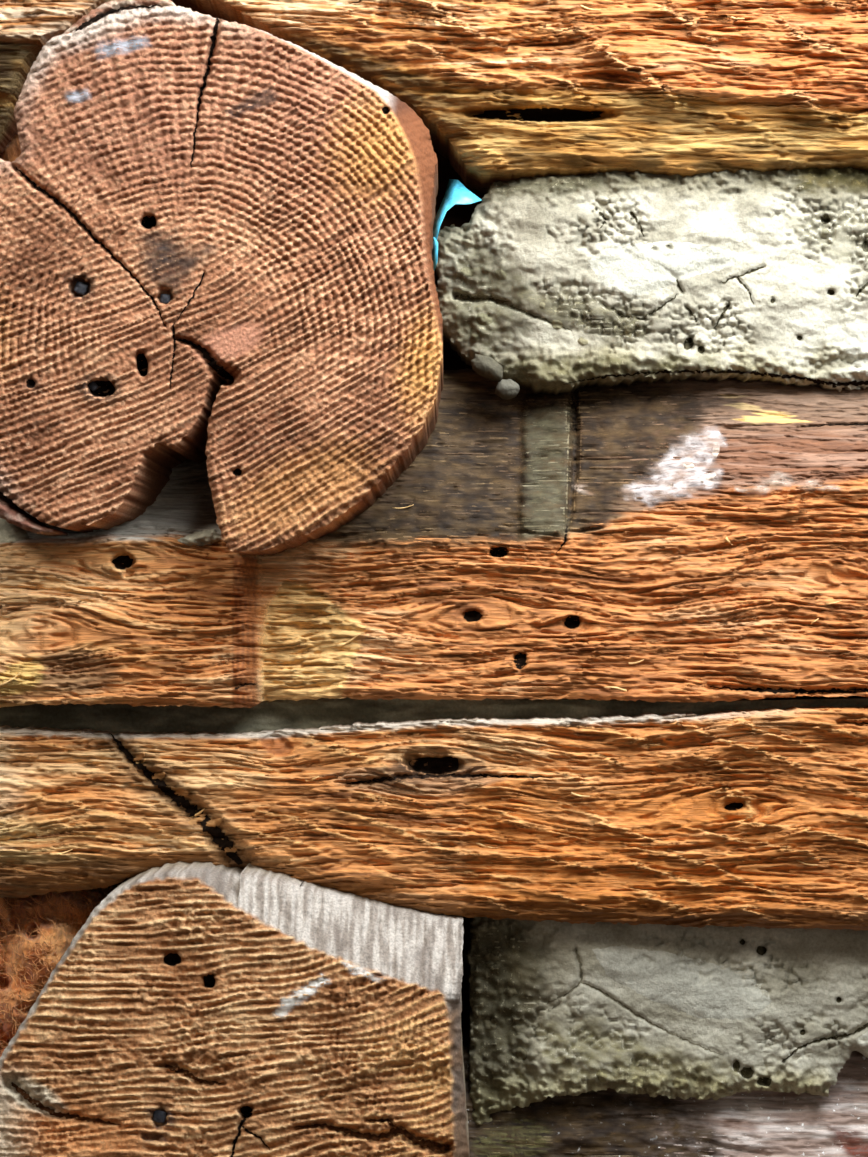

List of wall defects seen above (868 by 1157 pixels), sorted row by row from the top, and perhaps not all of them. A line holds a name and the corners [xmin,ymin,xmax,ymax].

crack [76,4,160,31]
crack [190,17,219,168]
crack [15,166,233,389]
water stain [341,386,735,545]
crack [782,1023,868,1062]
crack [11,1082,121,1125]
crack [230,1111,270,1157]